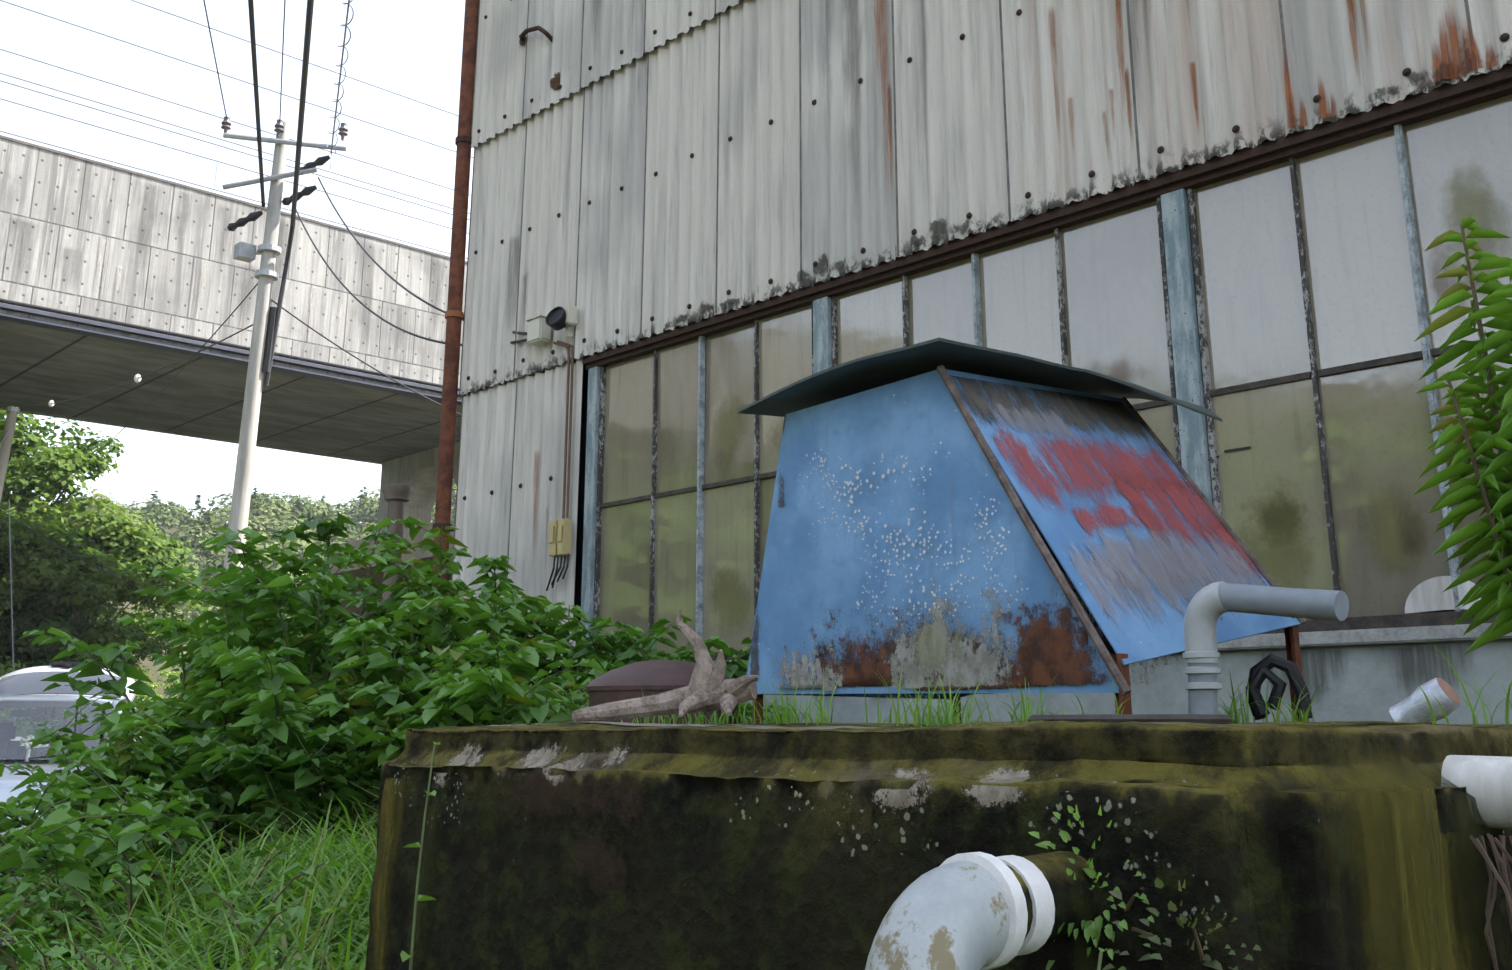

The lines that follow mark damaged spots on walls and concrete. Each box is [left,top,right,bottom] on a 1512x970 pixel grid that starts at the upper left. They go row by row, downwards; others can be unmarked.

rust [874,0,891,162]
rust [1105,0,1130,142]
rust [1284,66,1336,128]
rust [1347,0,1366,51]
leakage [1375,63,1459,97]
rust [1432,17,1497,83]
leakage [910,219,969,246]
leakage [797,254,846,282]
peeling [773,444,1265,696]
spalling [864,766,937,816]
spalling [961,764,1030,809]
leakage [1347,768,1500,970]